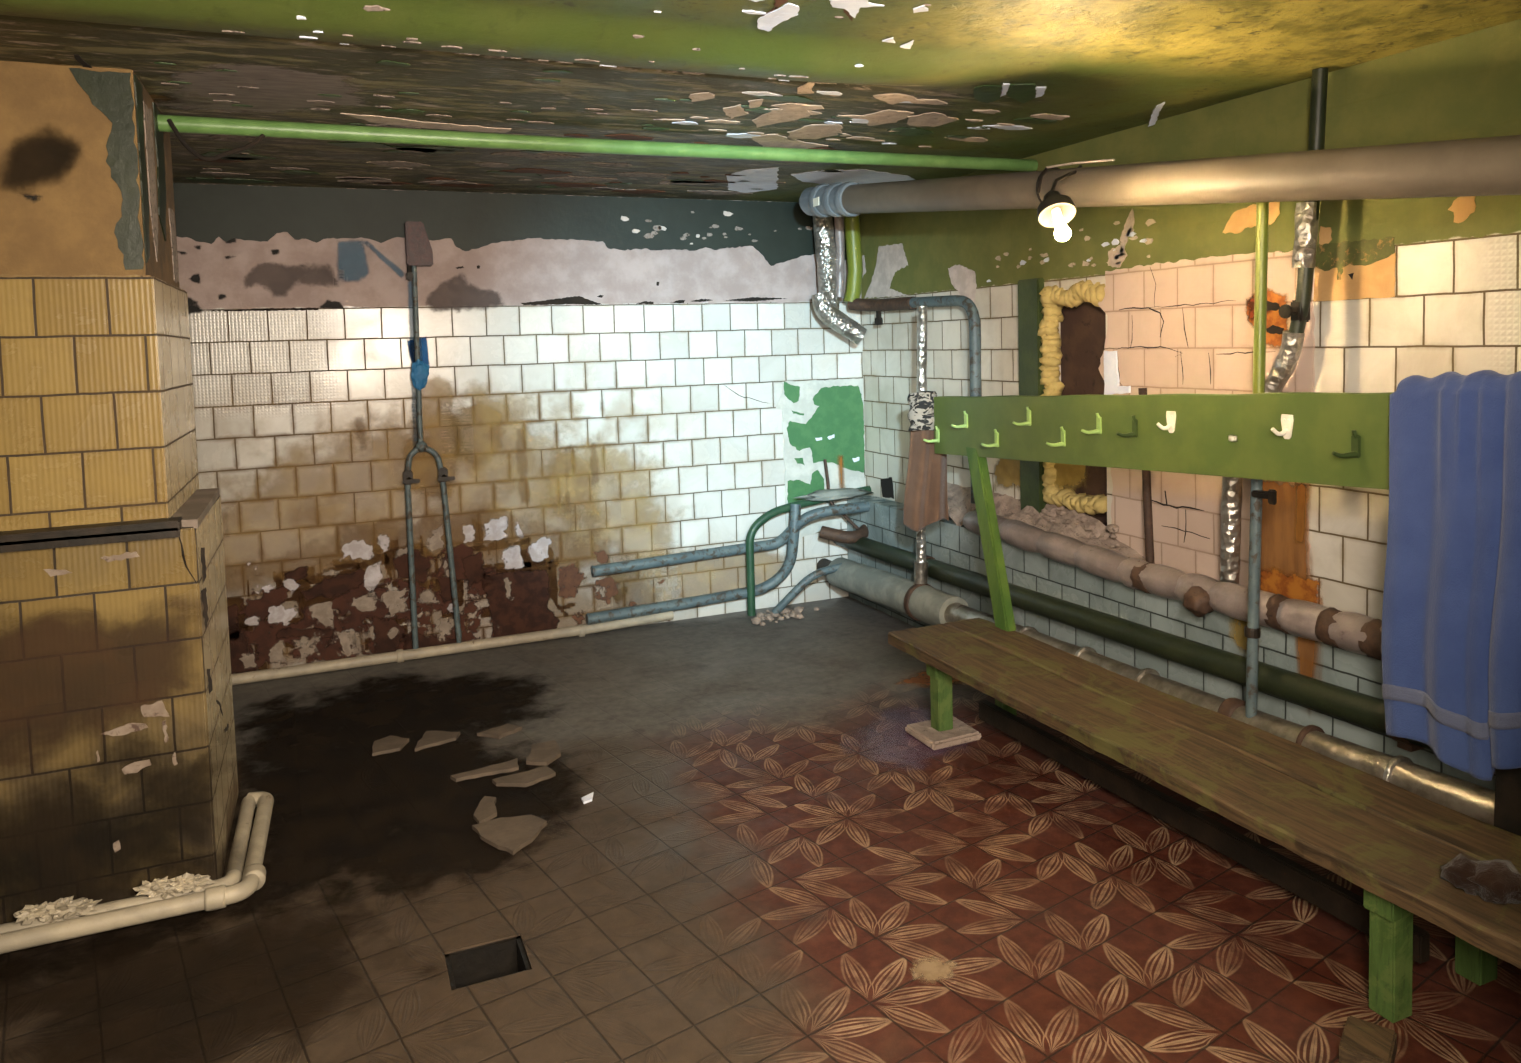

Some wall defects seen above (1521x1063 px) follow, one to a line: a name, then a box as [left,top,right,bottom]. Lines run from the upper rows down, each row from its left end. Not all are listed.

peeling [742,0,884,32]
peeling [882,37,914,49]
peeling [69,68,1070,283]
peeling [1223,202,1280,234]
peeling [1448,196,1476,223]
spalling [521,295,604,305]
spalling [636,282,787,304]
peeling [832,215,909,298]
peeling [948,209,1156,322]
peeling [1313,226,1396,301]
spalling [228,516,637,674]
rust [1232,480,1344,678]